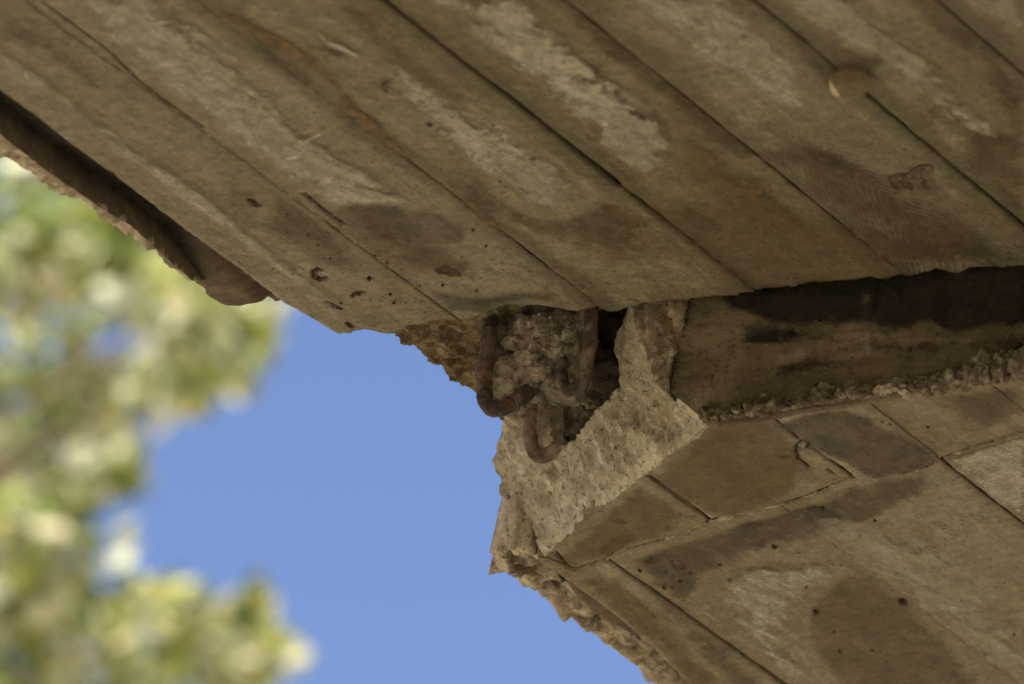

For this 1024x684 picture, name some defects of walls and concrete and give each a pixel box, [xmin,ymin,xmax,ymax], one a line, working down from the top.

hole [435,265,462,287]
damp [716,148,1024,343]
spalling [395,298,1024,559]
damp [636,411,933,601]